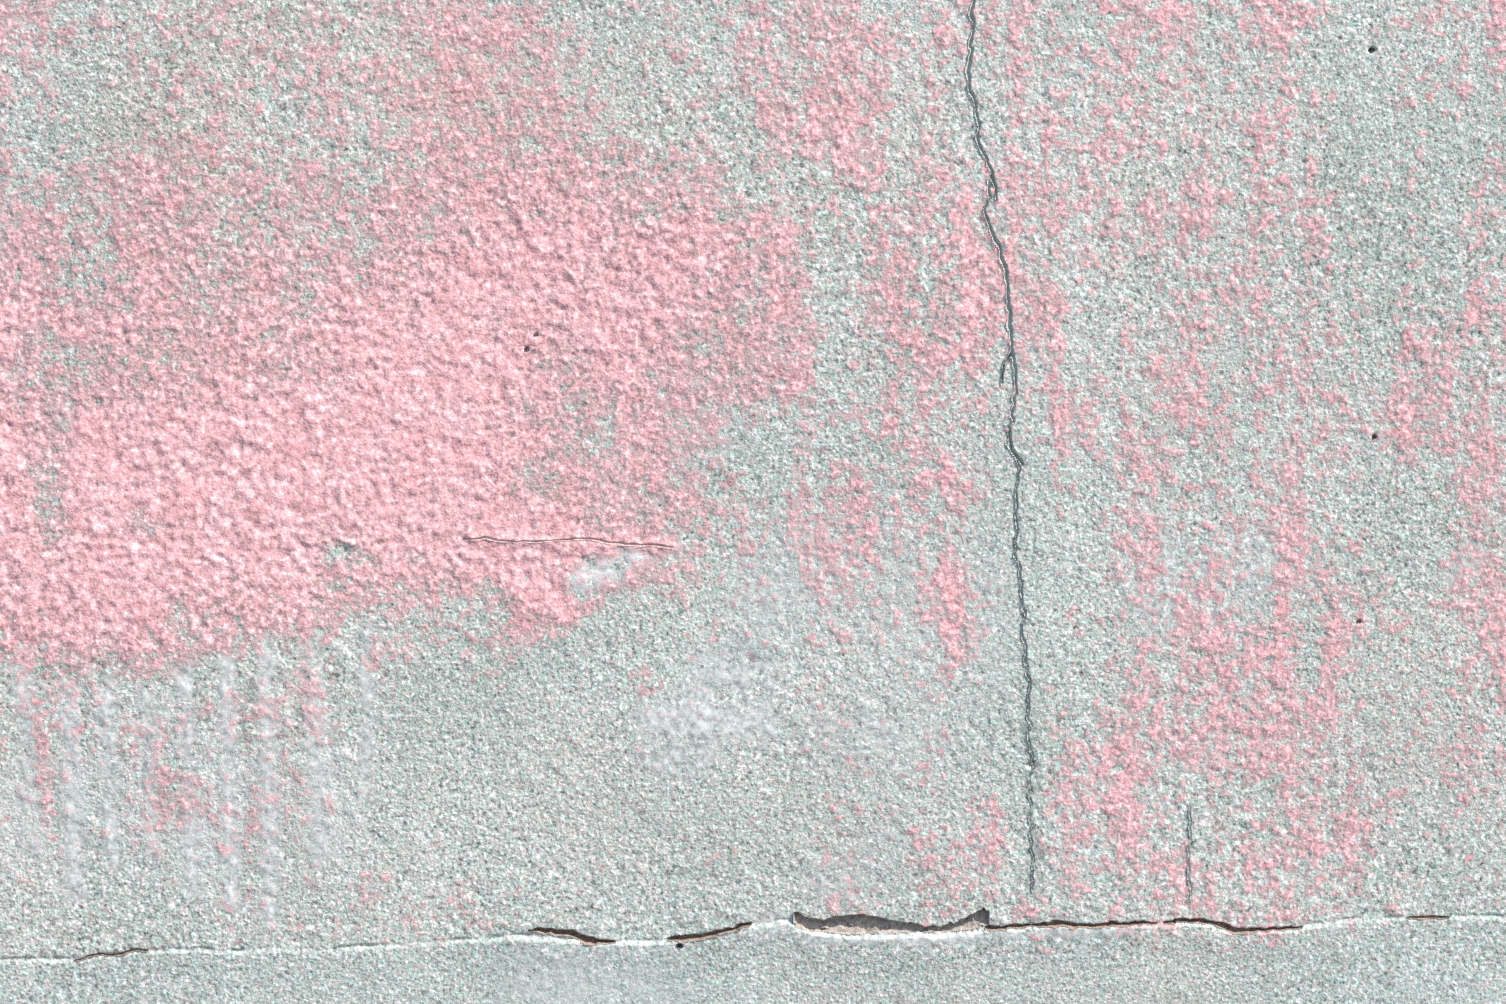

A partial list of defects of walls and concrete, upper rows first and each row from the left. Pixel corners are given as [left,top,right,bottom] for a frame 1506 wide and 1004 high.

crack [965,0,1303,934]
crack [1406,913,1450,921]
crack [528,927,616,946]
crack [668,922,752,943]
crack [73,948,148,961]